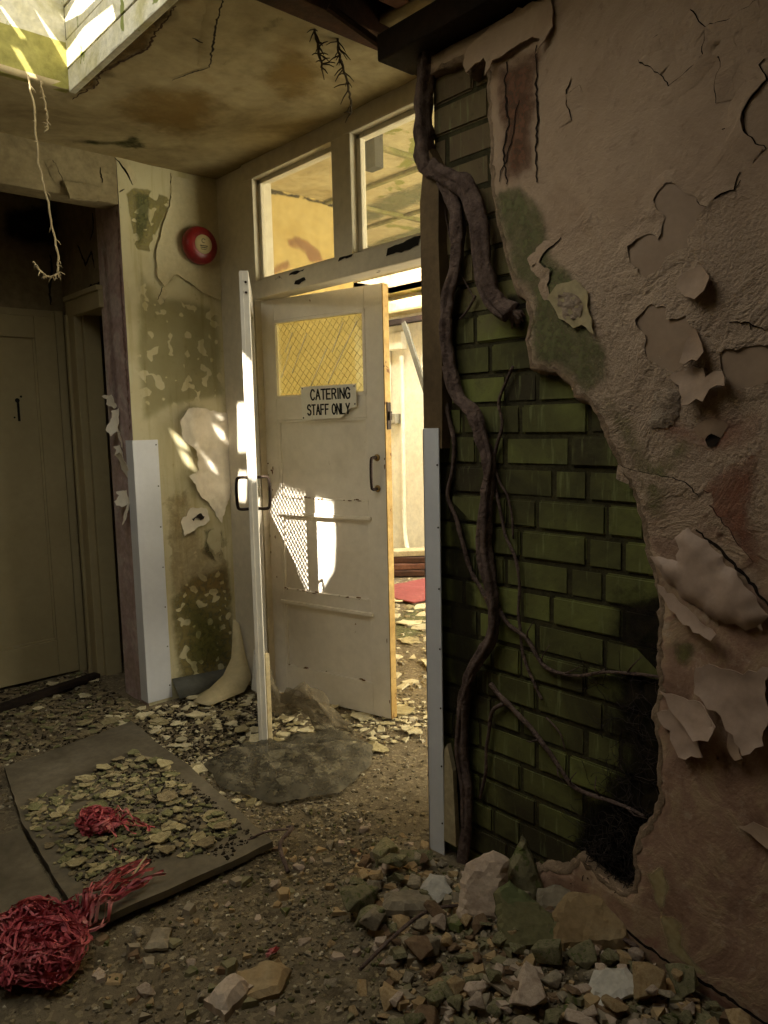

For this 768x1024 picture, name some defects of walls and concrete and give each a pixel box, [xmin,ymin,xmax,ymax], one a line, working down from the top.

crack [722,48,768,165]
crack [115,157,137,192]
peeling [180,407,231,536]
spalling [434,0,768,897]
water stain [173,570,232,677]